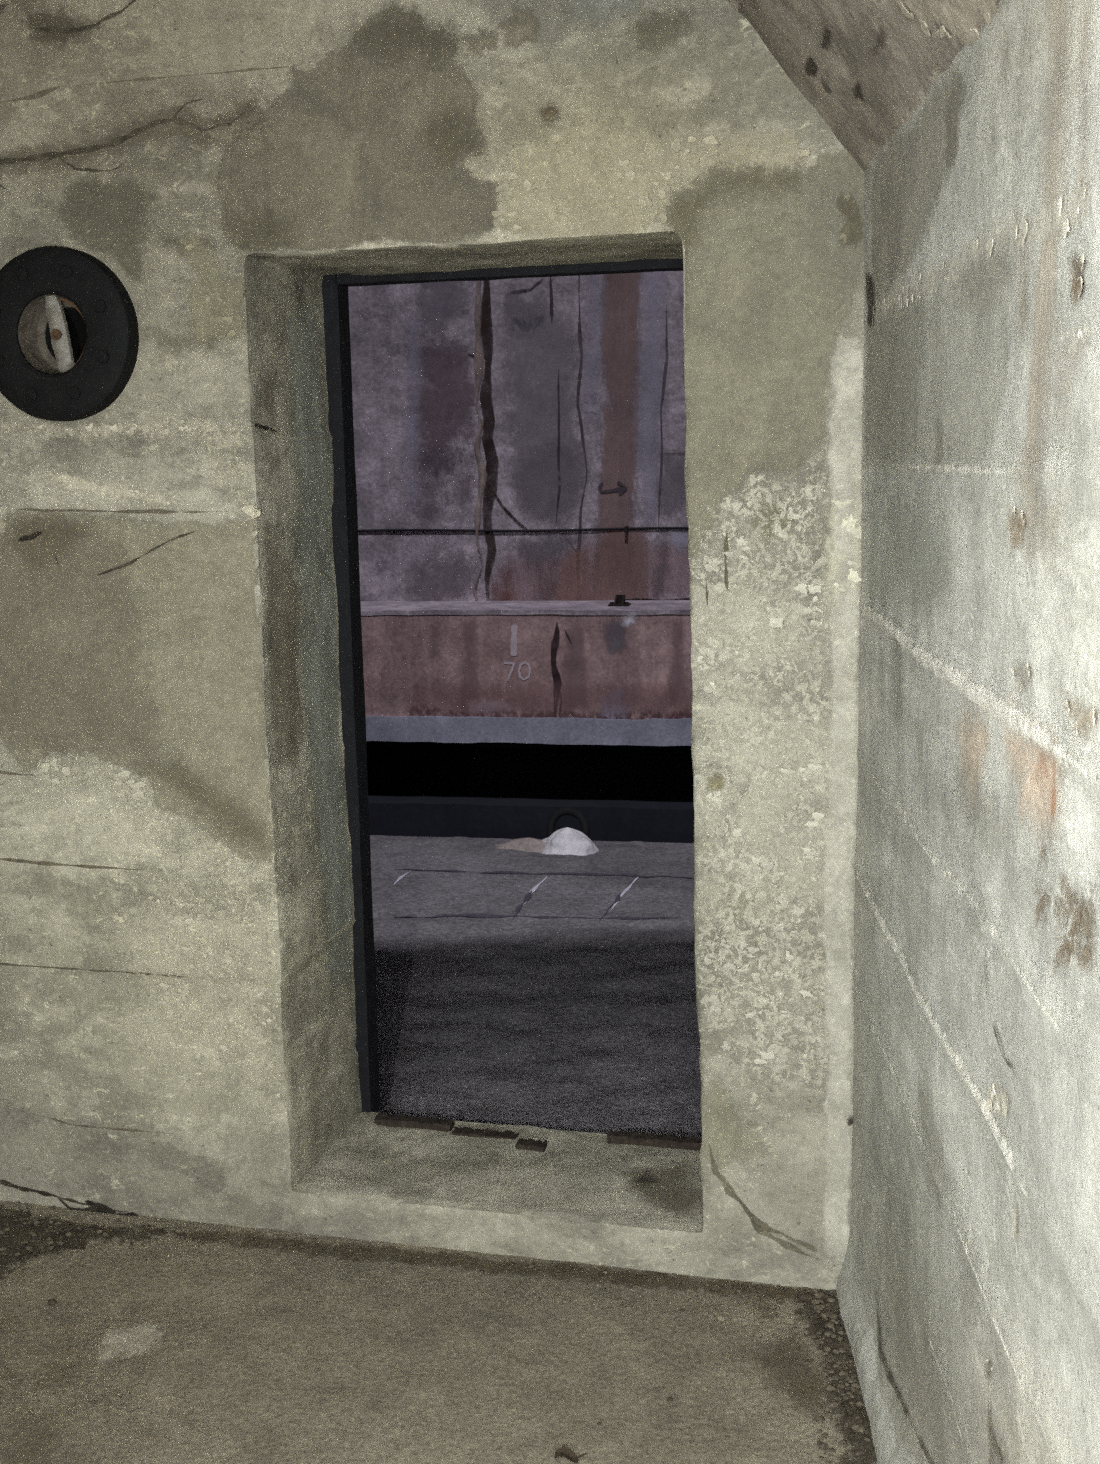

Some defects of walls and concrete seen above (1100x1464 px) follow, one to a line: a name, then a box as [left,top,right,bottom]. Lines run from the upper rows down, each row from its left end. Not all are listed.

crack [38,0,135,33]
crack [0,99,234,189]
water stain [112,0,633,251]
crack [468,275,587,715]
water stain [0,312,352,983]
corrosion [410,706,692,720]
corrosion [1011,734,1055,816]
crack [978,946,1018,1082]
crack [0,1180,138,1216]
crack [709,1149,819,1261]
crack [875,1294,932,1464]
crack [987,1401,1002,1464]